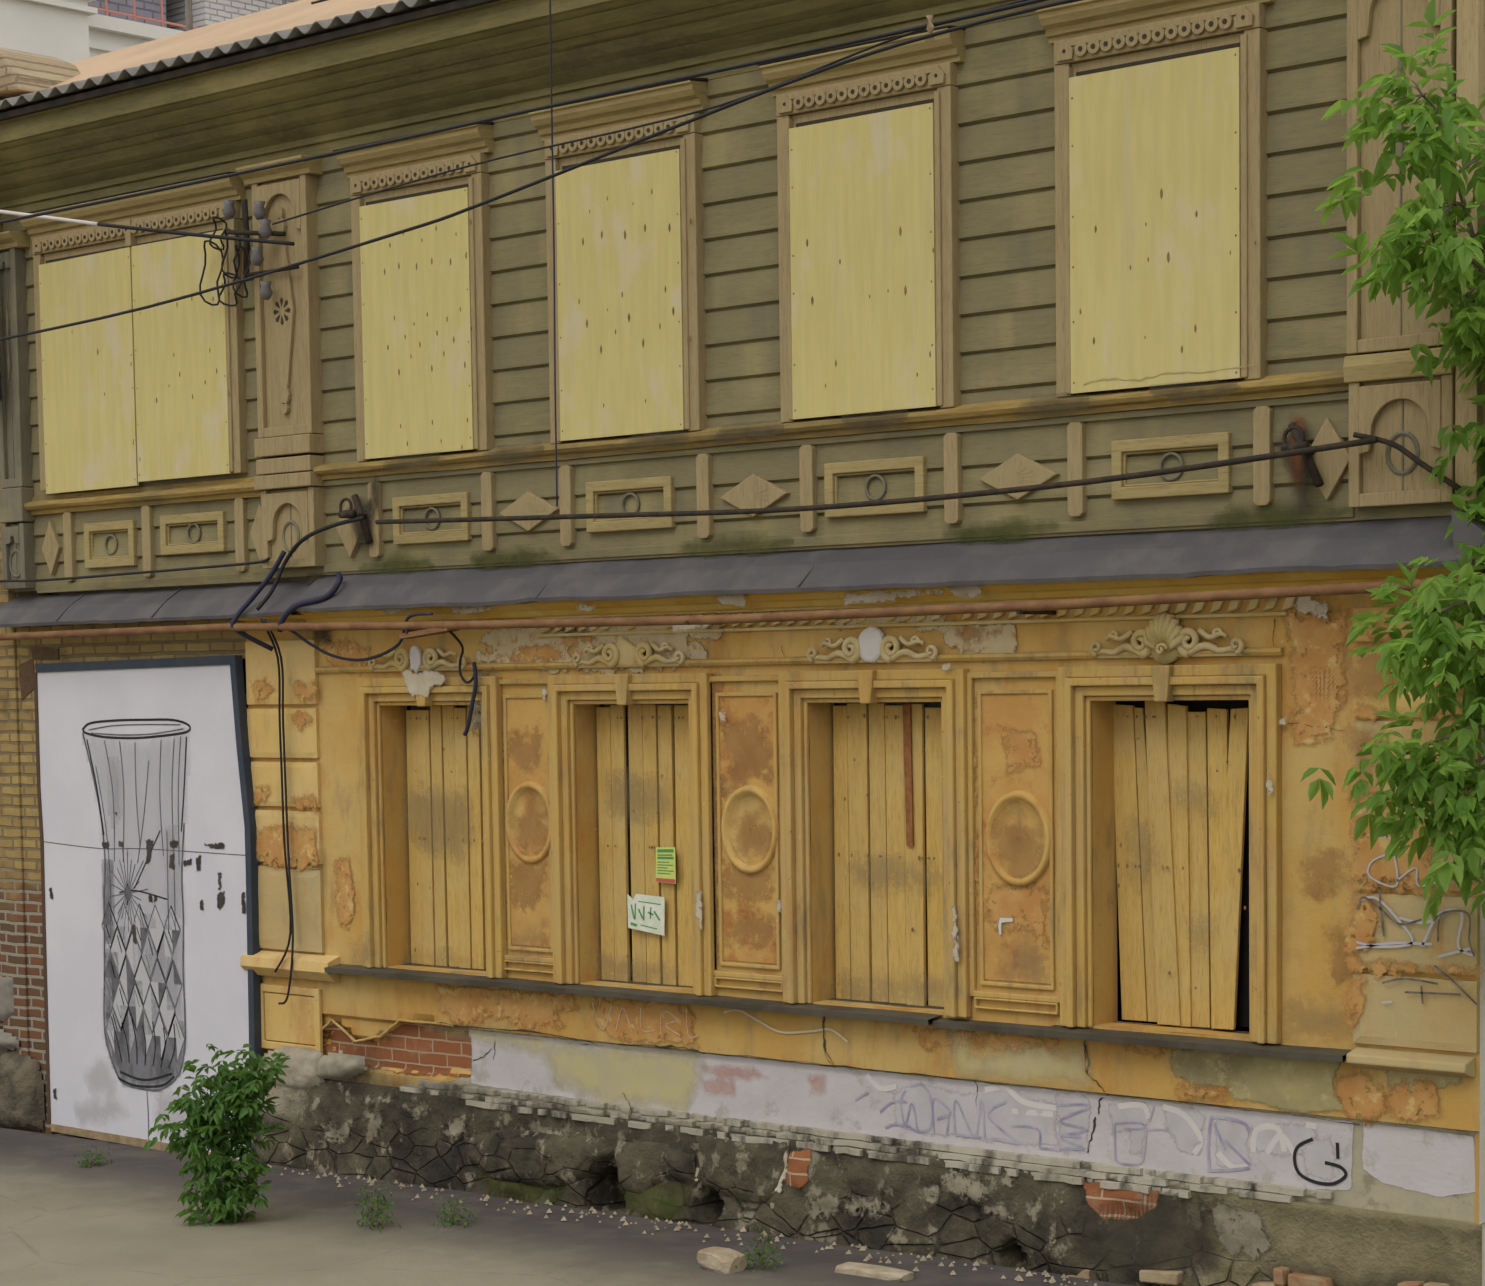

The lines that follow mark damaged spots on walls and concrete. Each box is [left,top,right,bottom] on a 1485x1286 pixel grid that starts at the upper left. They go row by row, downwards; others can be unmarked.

flaking render [834,585,1017,671]
flaking render [451,603,782,929]
peeling [1279,596,1482,1027]
peeling [256,794,355,930]
peeling [975,825,1050,948]
peeling [951,905,959,962]
flaking render [322,983,696,1077]
flaking render [324,1091,428,1144]
flaking render [447,1114,467,1138]
peeling [1334,1070,1442,1125]
flaking render [1049,1221,1057,1250]
flaking render [1084,1182,1159,1220]